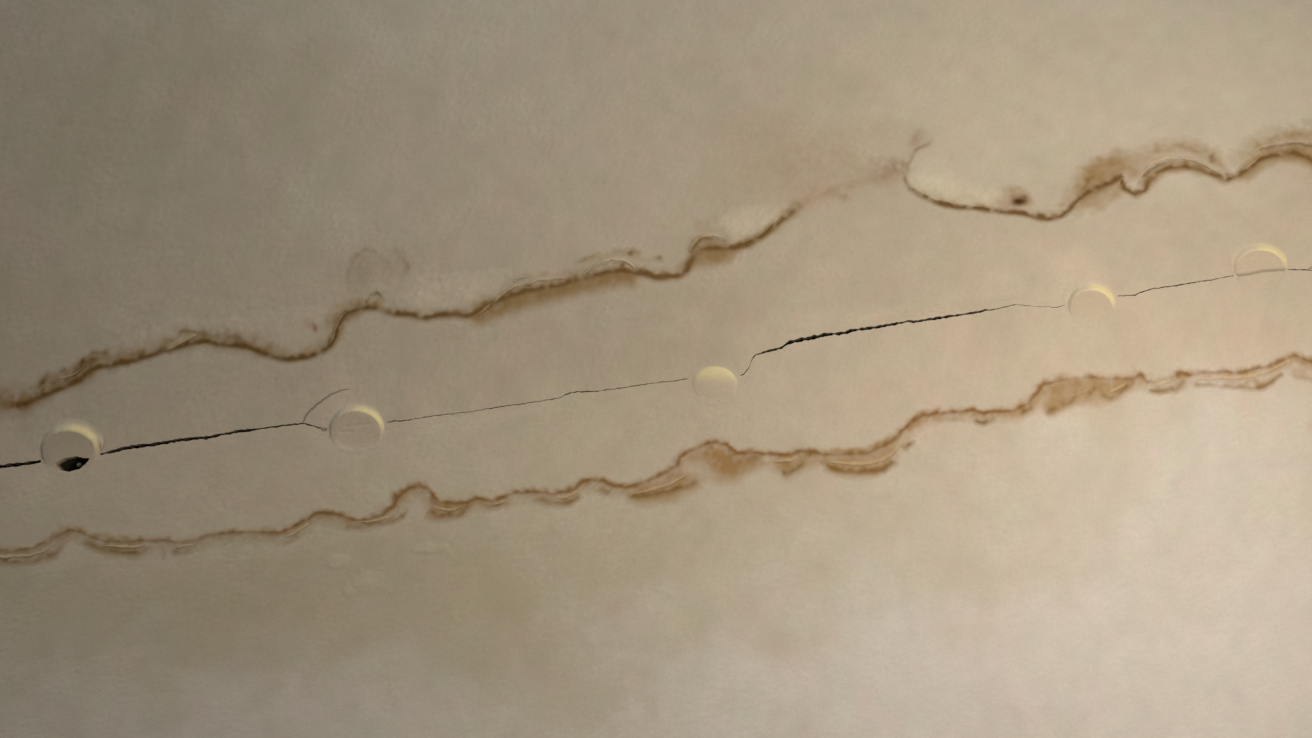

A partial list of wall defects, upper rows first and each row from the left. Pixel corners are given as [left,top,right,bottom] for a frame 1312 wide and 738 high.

water stain [4,107,1312,411]
crack [1119,275,1233,296]
crack [741,304,1064,376]
crack [103,388,349,454]
crack [388,379,685,423]
crack [0,460,41,468]